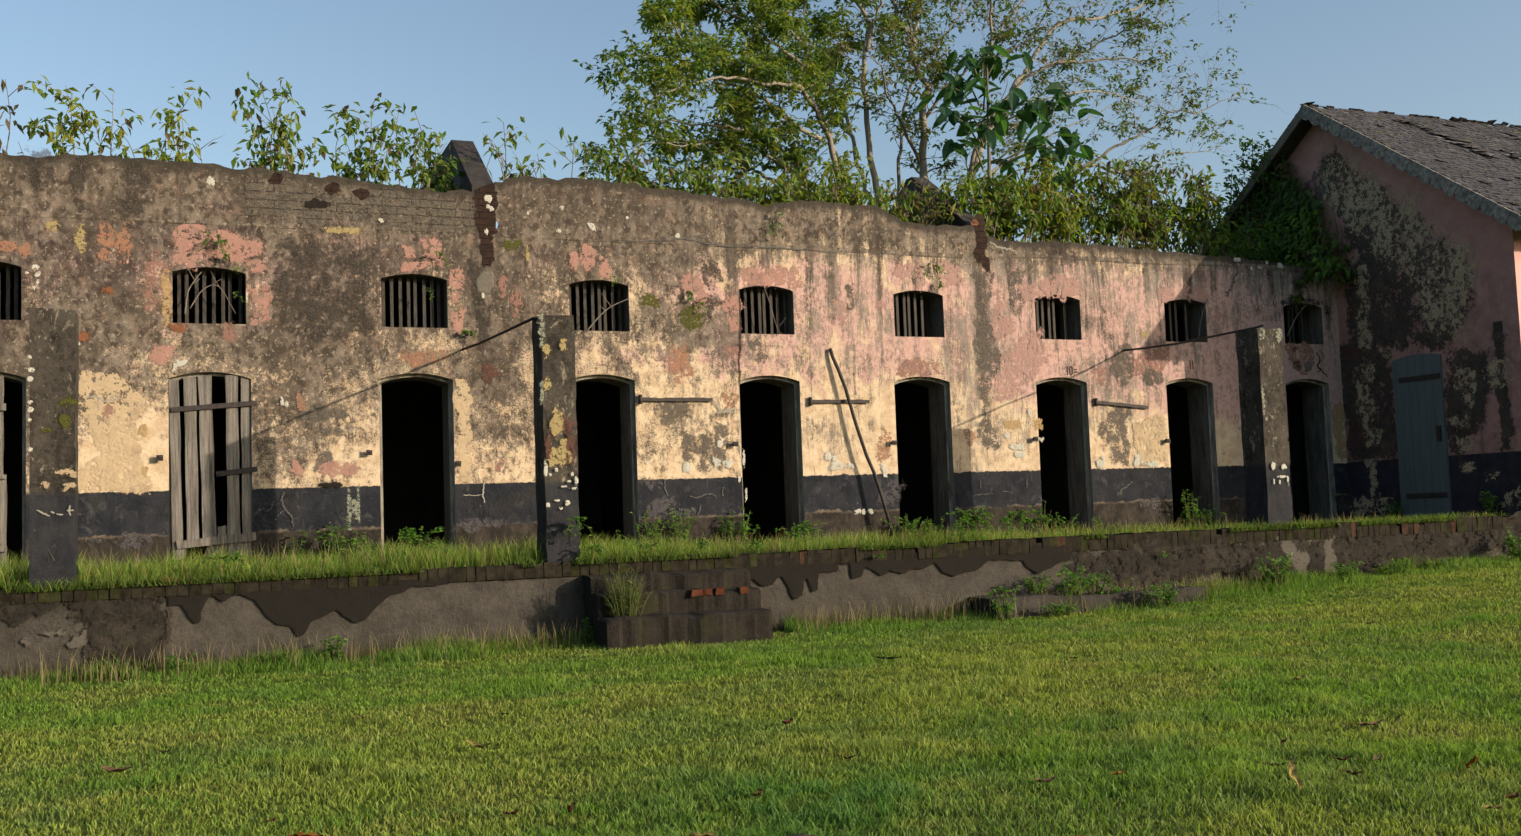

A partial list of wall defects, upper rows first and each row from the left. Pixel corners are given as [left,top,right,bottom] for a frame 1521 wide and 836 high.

spalling [96,172,524,365]
water stain [844,284,855,310]
water stain [970,268,1044,458]
water stain [1281,145,1516,466]
peeling [1320,141,1521,518]
peeling [41,369,152,496]
peeling [289,459,361,488]
peeling [452,378,475,482]
peeling [1132,415,1170,467]
water stain [168,577,457,637]